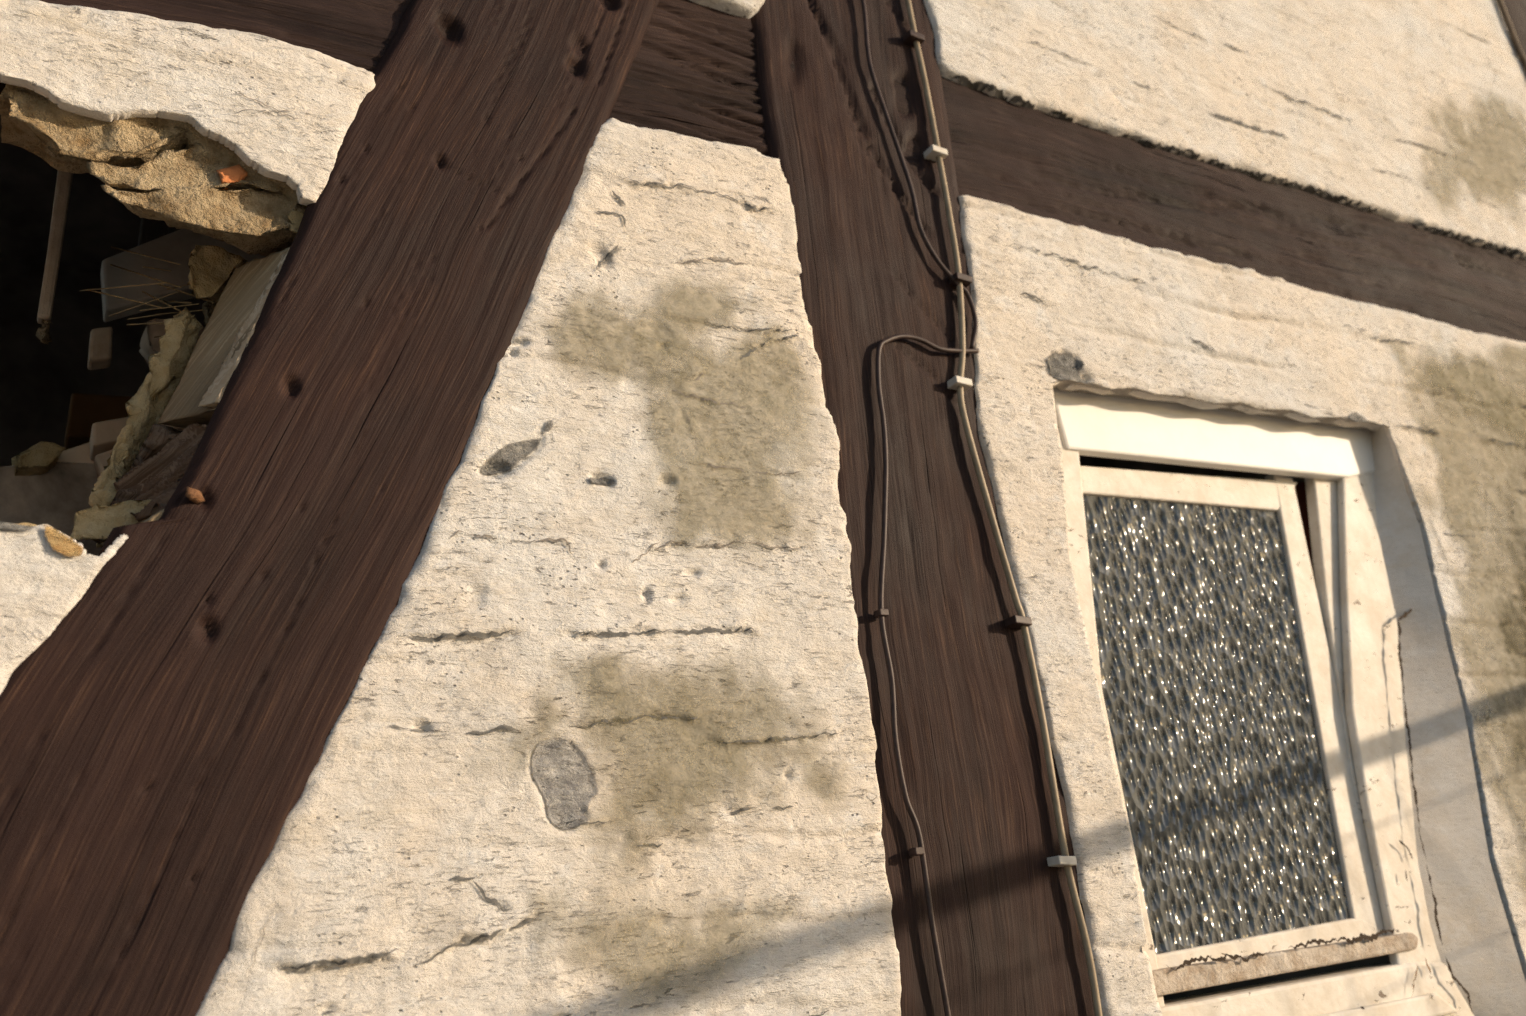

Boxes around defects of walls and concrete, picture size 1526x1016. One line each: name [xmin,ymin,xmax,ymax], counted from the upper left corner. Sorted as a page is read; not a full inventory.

damp [1434,101,1526,208]
spalling [0,84,307,556]
damp [556,286,801,541]
damp [1414,347,1526,825]
spalling [532,739,597,830]
damp [582,658,777,824]
damp [589,918,741,987]